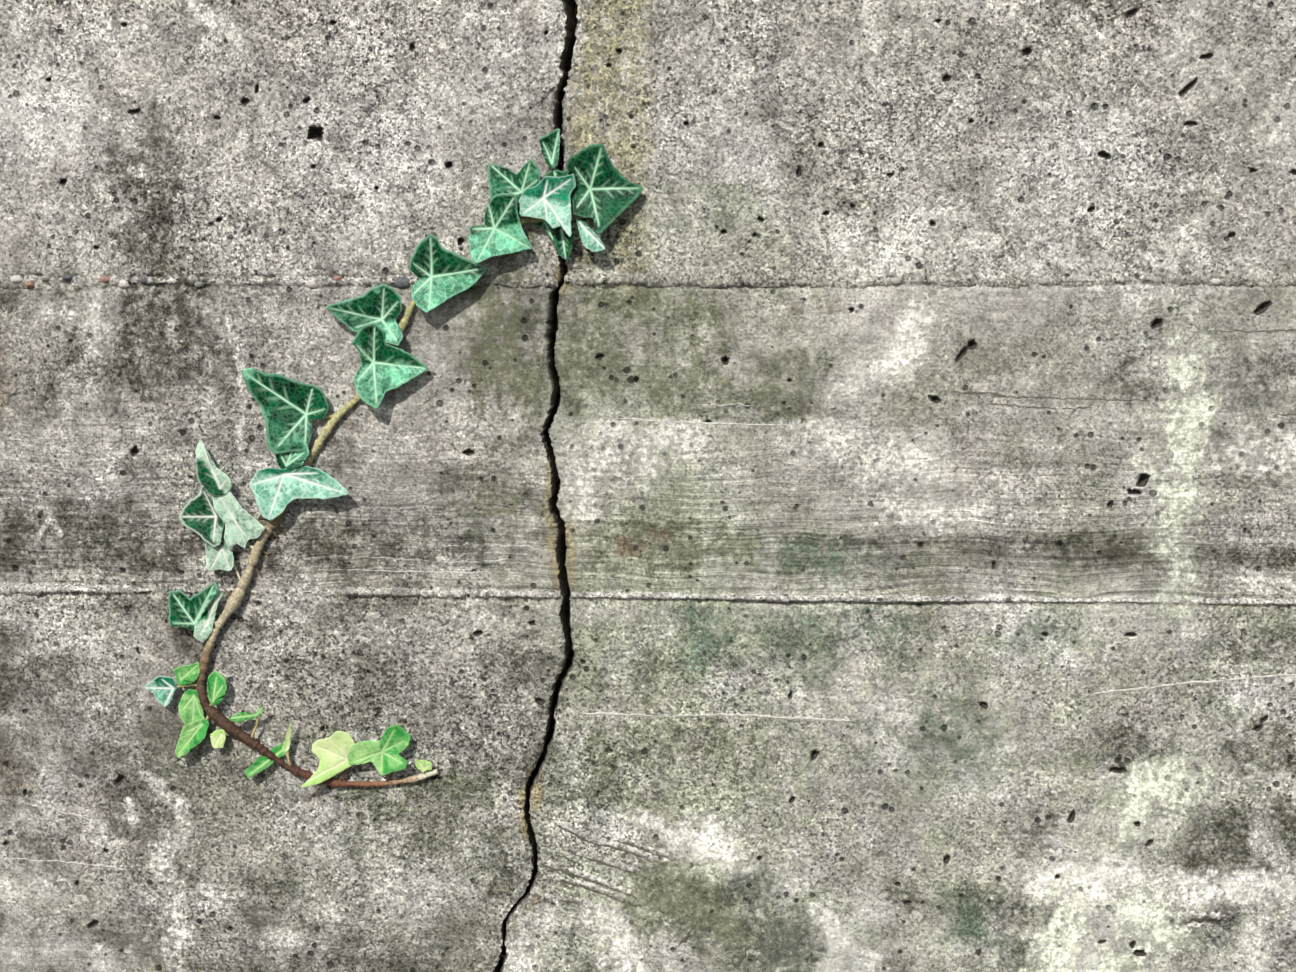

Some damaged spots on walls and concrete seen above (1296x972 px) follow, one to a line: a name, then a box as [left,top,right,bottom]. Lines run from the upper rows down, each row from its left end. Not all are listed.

crack [545,0,579,171]
crack [307,248,876,972]